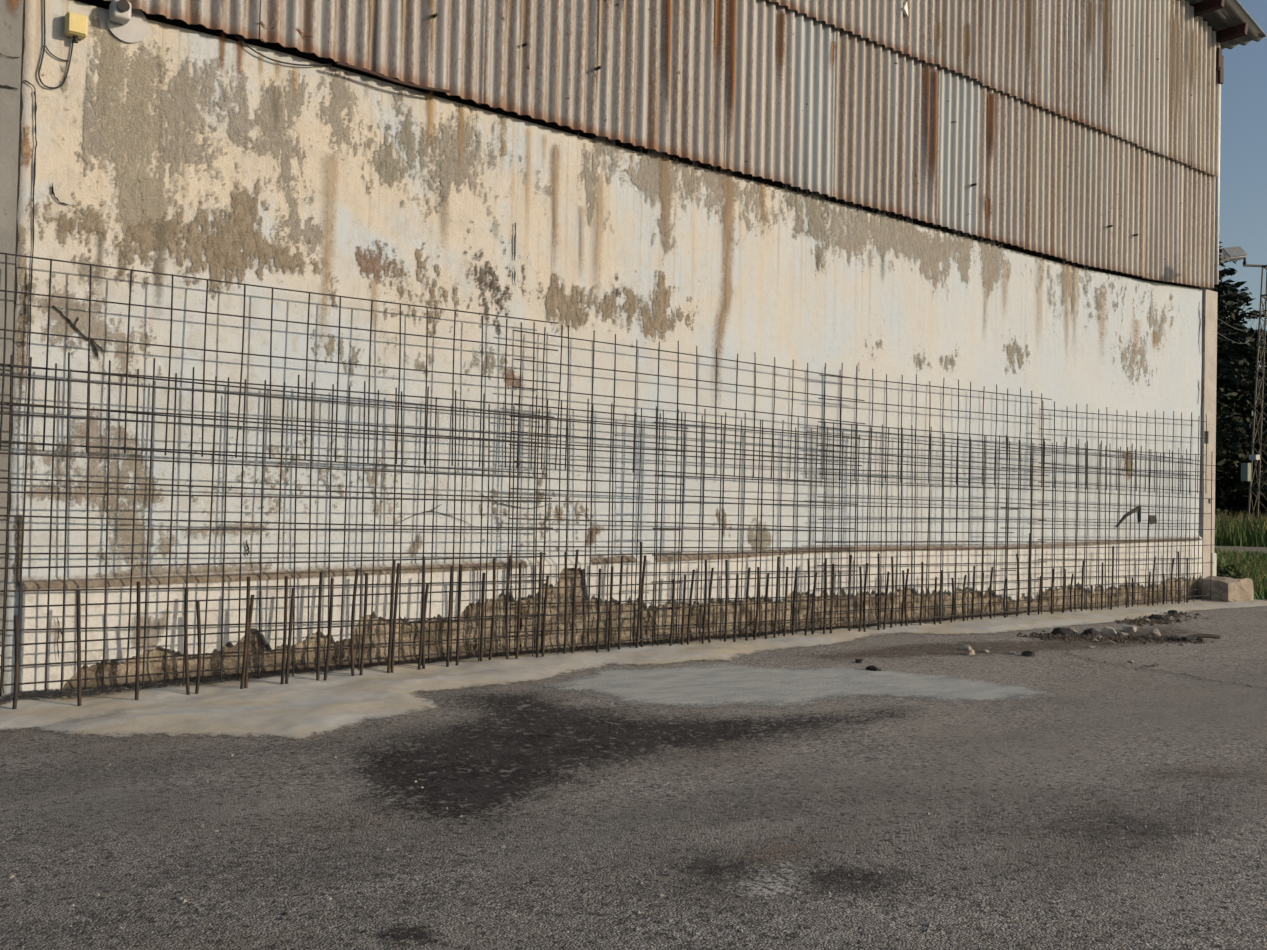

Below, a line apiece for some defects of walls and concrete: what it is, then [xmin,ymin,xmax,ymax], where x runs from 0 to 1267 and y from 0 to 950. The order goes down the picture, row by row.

corrosion [220,30,244,71]
corrosion [429,0,437,58]
corrosion [663,0,672,122]
corrosion [705,0,737,127]
corrosion [777,11,786,76]
corrosion [1086,0,1112,81]
corrosion [1170,17,1198,115]
corrosion [923,65,938,190]
corrosion [987,93,995,157]
corrosion [552,145,560,247]
peeling [0,15,1215,696]